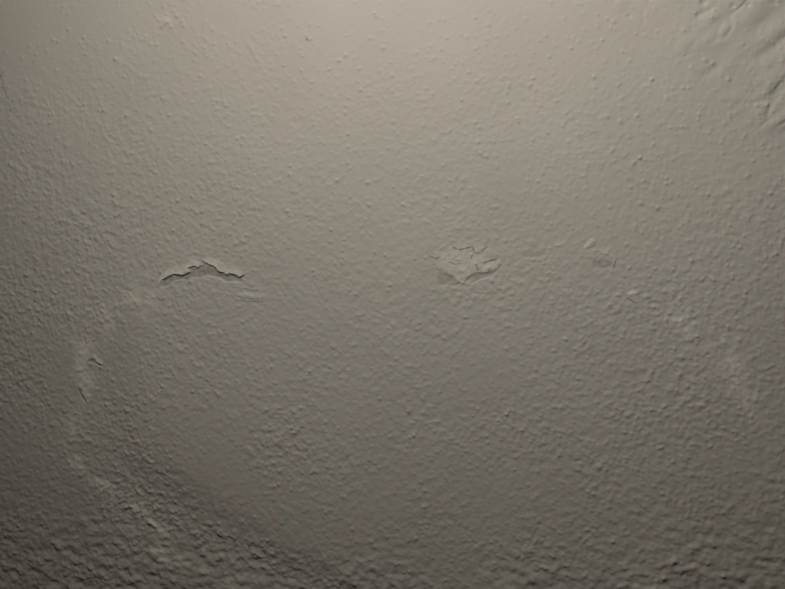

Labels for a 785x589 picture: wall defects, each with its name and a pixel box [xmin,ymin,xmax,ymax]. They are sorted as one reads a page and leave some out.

peeling [158,256,266,302]
peeling [429,239,501,288]